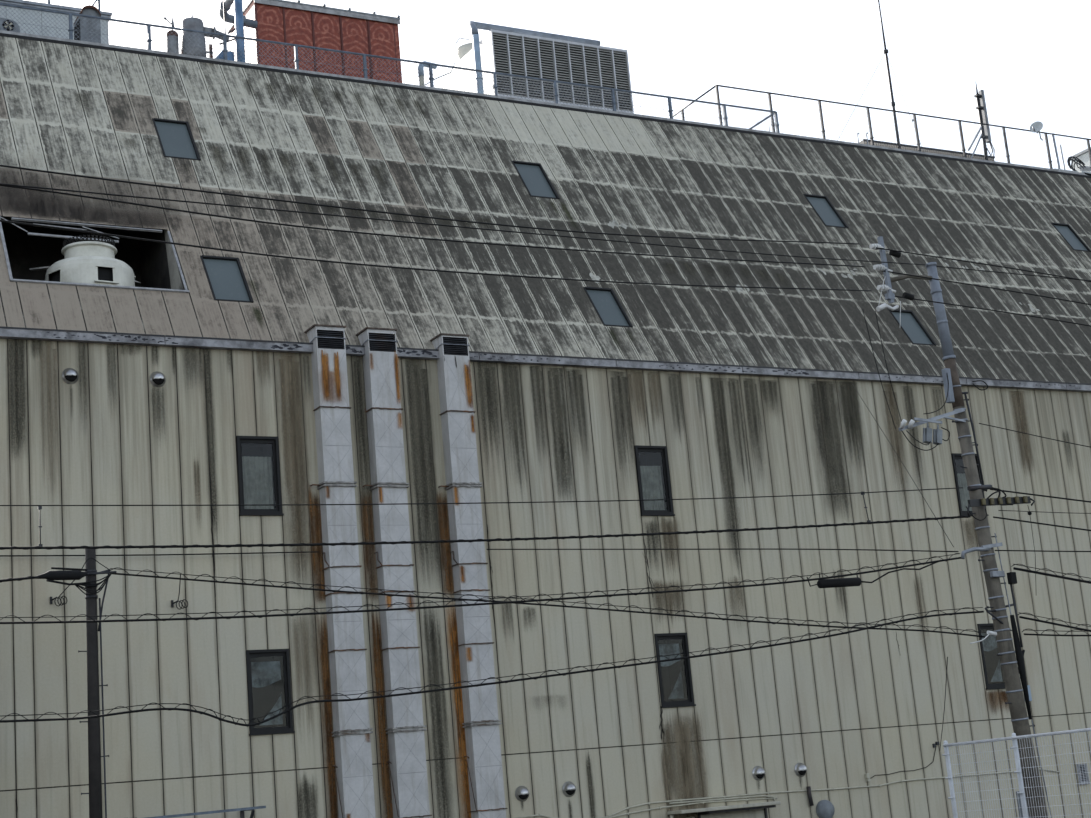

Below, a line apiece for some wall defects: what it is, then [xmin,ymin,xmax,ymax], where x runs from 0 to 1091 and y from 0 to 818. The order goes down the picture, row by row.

damp [11,186,151,226]
damp [196,348,216,522]
damp [531,366,585,488]
damp [711,378,776,552]
damp [812,381,859,507]
corrosion [309,486,329,600]
corrosion [363,487,391,607]
corrosion [438,487,465,592]
corrosion [318,622,350,818]
corrosion [367,615,393,818]
corrosion [449,612,472,818]
damp [663,720,705,818]